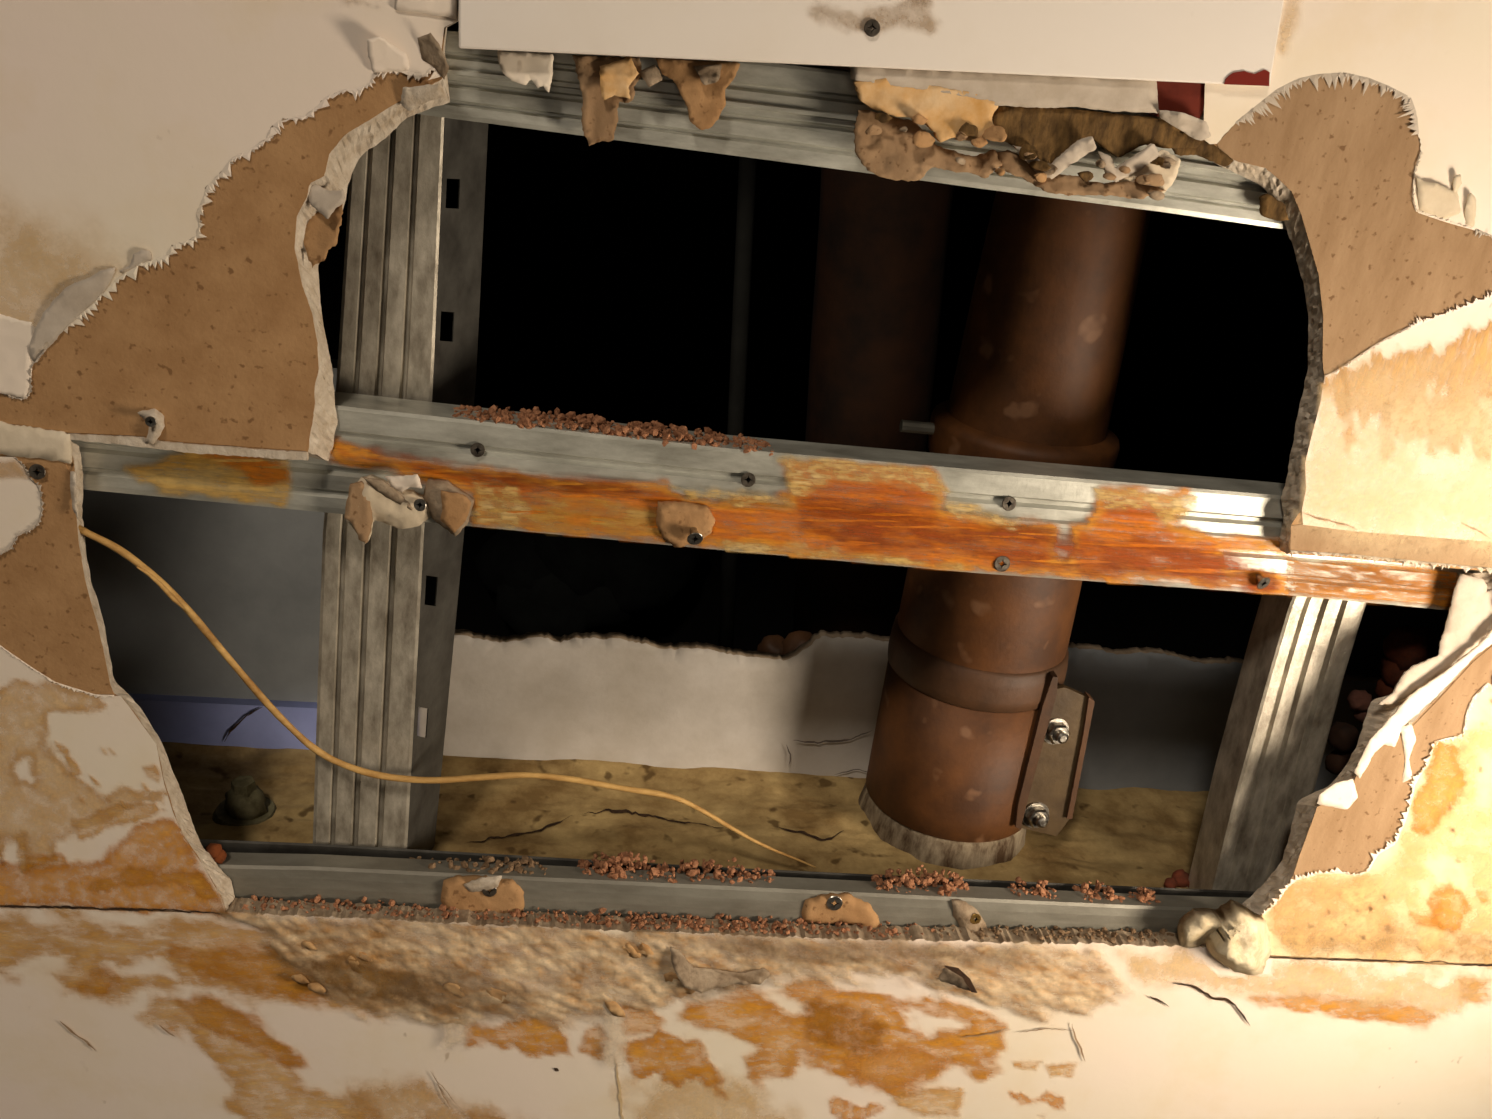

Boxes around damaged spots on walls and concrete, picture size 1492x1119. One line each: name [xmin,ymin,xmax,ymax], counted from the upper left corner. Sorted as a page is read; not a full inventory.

peeling [367,33,449,79]
peeling [1224,70,1270,86]
peeling [0,314,36,398]
leakage [1309,322,1492,550]
rust [128,453,290,506]
peeling [385,474,422,492]
rust [332,440,1458,608]
leakage [0,680,501,1119]
leakage [1130,731,1492,1023]
leakage [466,1016,605,1059]
leakage [621,978,1006,1119]
crack [1150,983,1250,1025]